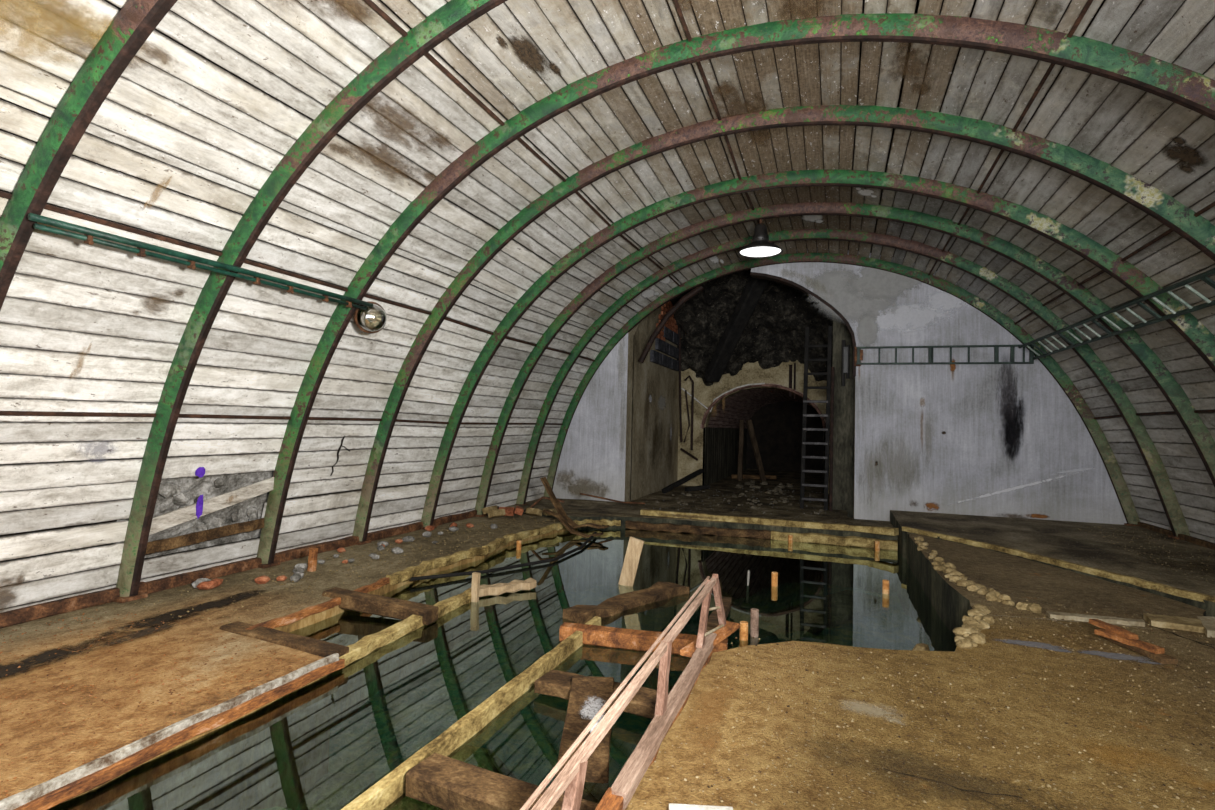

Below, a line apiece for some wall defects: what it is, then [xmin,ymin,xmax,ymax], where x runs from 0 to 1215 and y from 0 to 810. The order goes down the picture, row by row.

leakage [496,36,561,75]
leakage [1162,137,1205,173]
leakage [1002,364,1020,458]
crack [330,436,350,476]